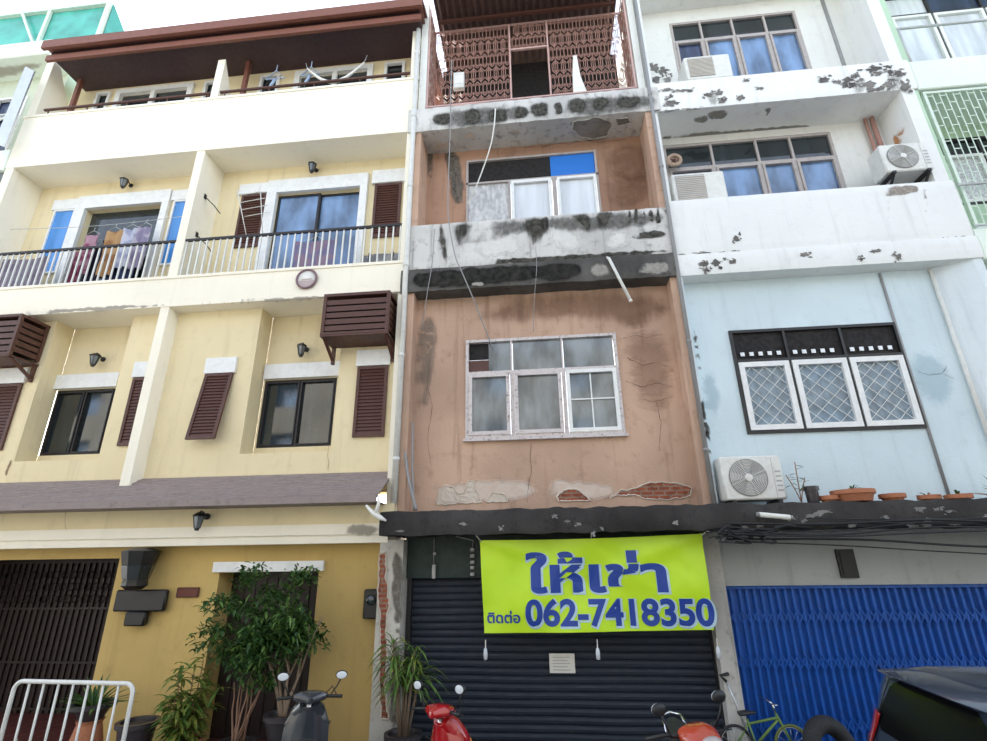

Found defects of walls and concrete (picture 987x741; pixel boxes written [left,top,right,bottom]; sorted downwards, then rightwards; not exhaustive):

peeling [649,62,745,113]
peeling [818,63,913,93]
mould [433,95,654,127]
damp [495,145,666,243]
damp [413,224,665,287]
peeling [678,231,742,275]
peeling [856,248,902,263]
flaking render [436,480,508,506]
spalling [556,488,591,502]
spalling [610,481,692,501]
spalling [377,552,390,720]